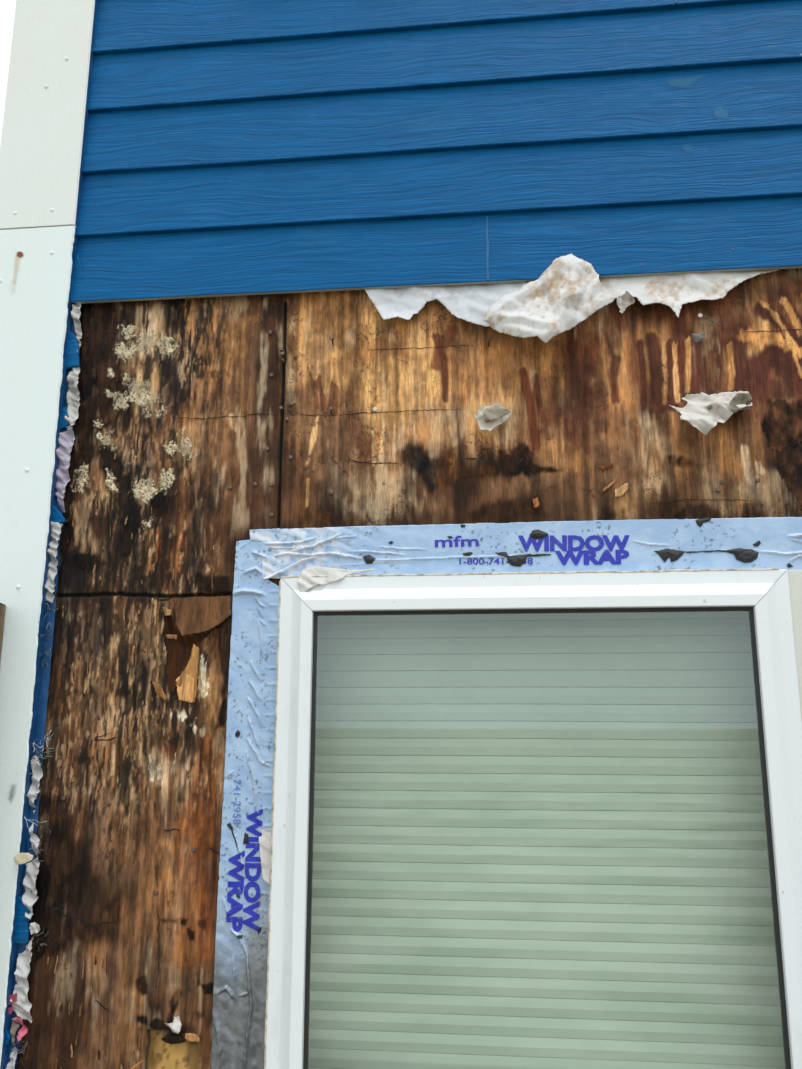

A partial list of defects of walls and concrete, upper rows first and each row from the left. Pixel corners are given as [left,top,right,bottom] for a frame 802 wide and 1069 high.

damp [75,306,166,556]
damp [401,443,557,491]
damp [761,399,802,515]
damp [472,499,538,523]
damp [661,504,712,519]
damp [744,503,761,518]
damp [60,512,105,569]
peeling [123,575,231,722]
damp [170,615,232,737]
damp [30,793,114,965]
damp [197,978,214,994]
damp [137,995,186,1050]